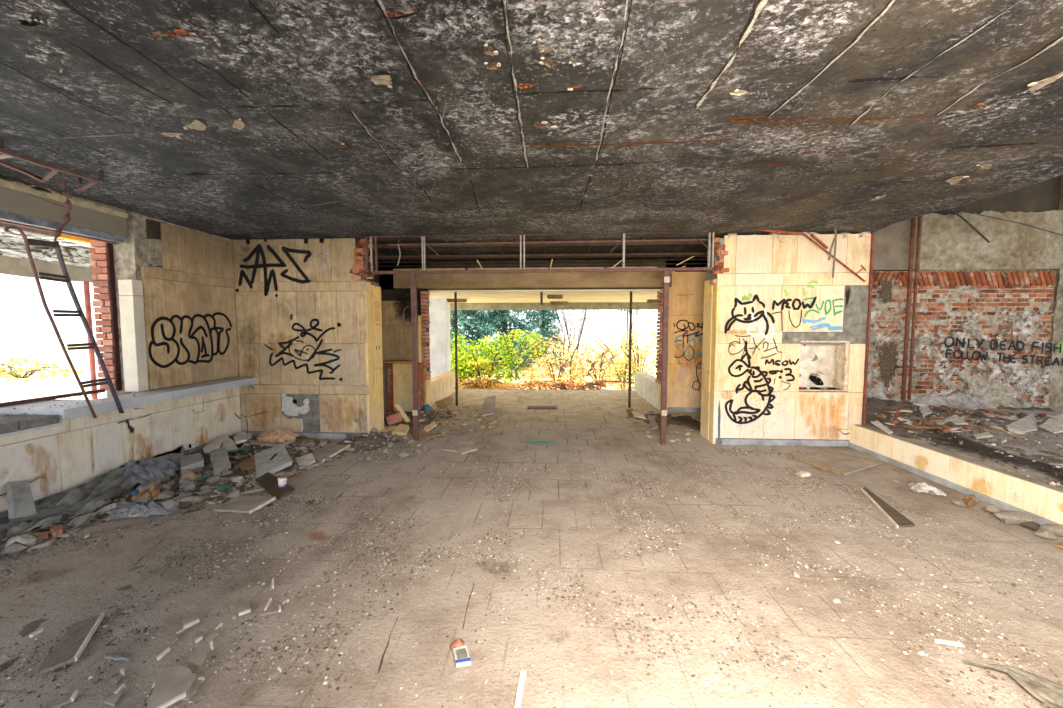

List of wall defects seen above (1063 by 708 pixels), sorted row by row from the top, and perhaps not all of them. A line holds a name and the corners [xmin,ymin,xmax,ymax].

peeling [371,75,392,88]
spalling [960,373,1018,407]
spalling [281,394,320,432]